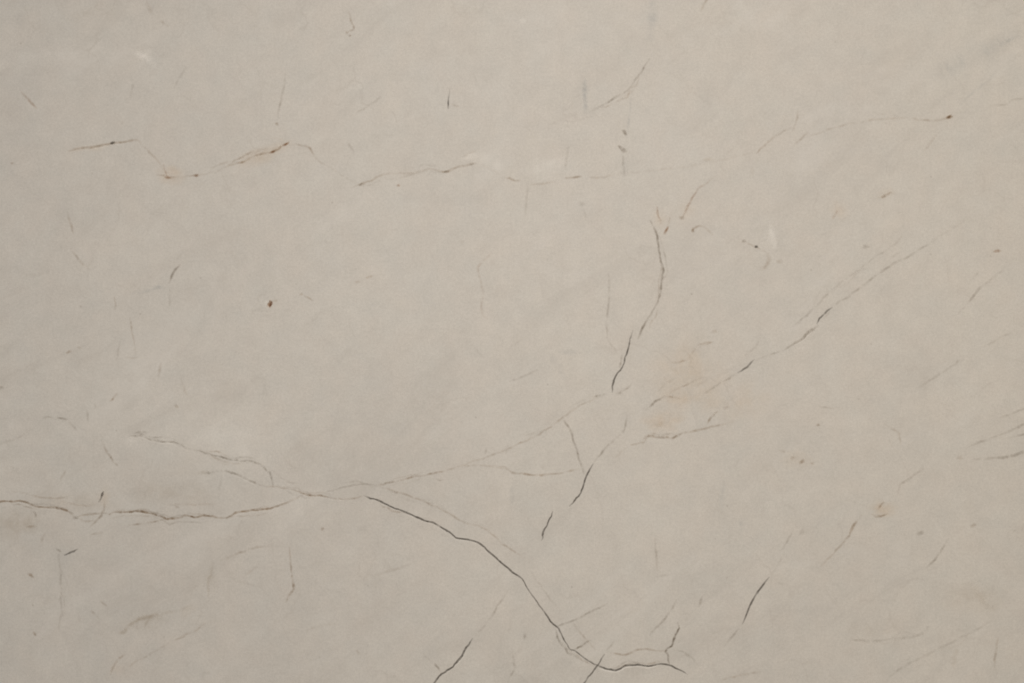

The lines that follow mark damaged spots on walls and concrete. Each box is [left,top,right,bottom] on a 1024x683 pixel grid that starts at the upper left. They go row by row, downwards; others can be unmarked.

crack [369,498,517,575]
crack [437,646,472,679]
crack [545,613,677,677]